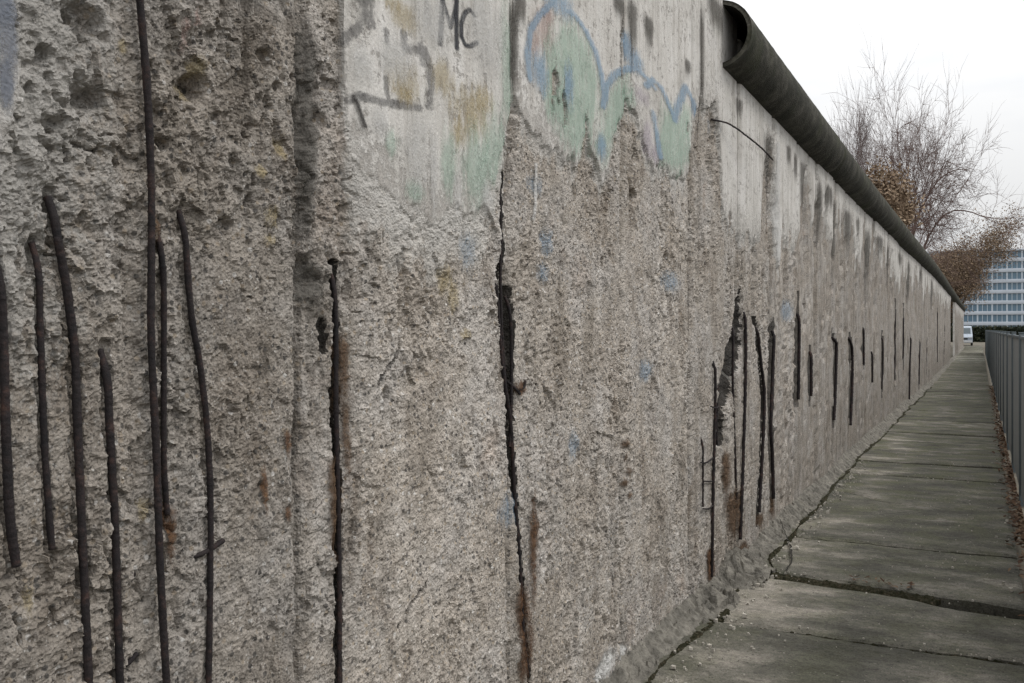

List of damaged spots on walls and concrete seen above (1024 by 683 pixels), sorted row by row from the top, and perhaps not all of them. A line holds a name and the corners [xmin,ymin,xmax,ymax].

spalling [0,0,163,683]
rust [329,336,351,545]
rust [518,496,540,682]
spalling [144,0,963,683]
rust [722,451,749,550]